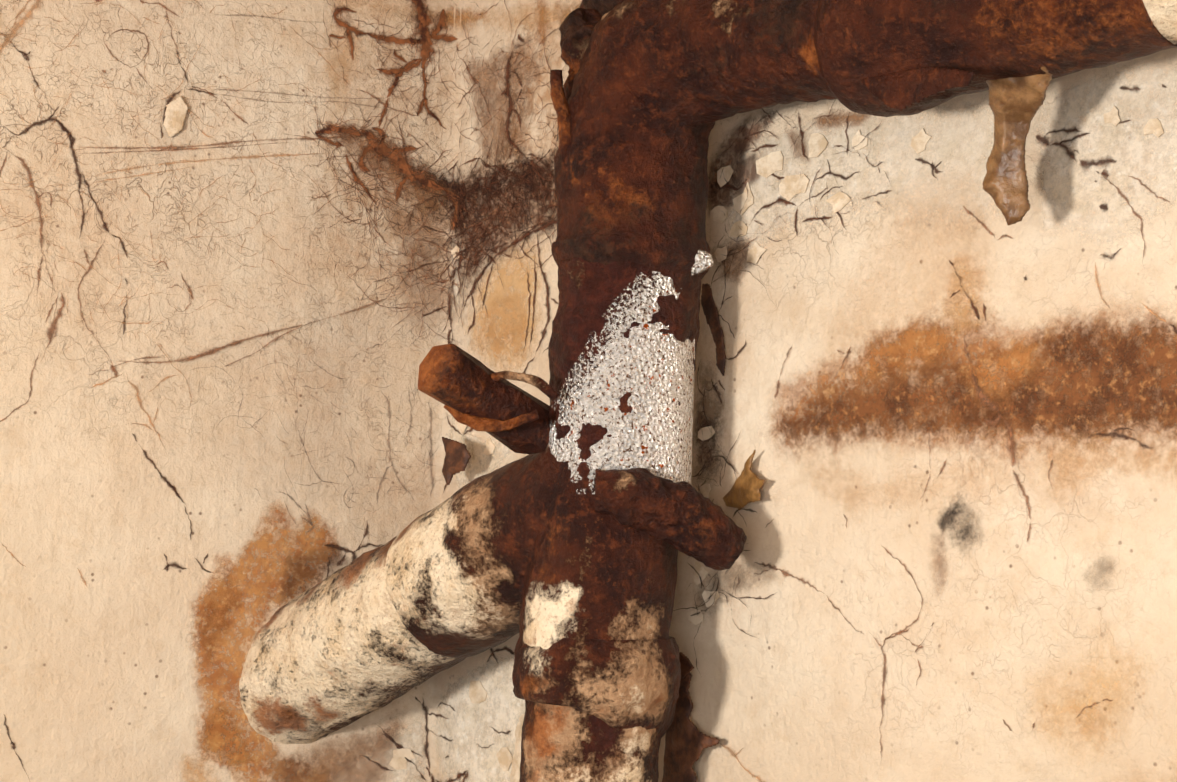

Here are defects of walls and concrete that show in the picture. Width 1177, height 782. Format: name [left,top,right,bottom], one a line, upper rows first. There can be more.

crack [102,0,247,138]
water stain [338,132,555,229]
crack [745,114,892,233]
crack [916,158,941,180]
crack [963,206,1012,240]
crack [1107,176,1169,261]
crack [0,33,213,573]
rust [776,320,1177,450]
rust [195,507,398,782]
crack [755,549,934,752]